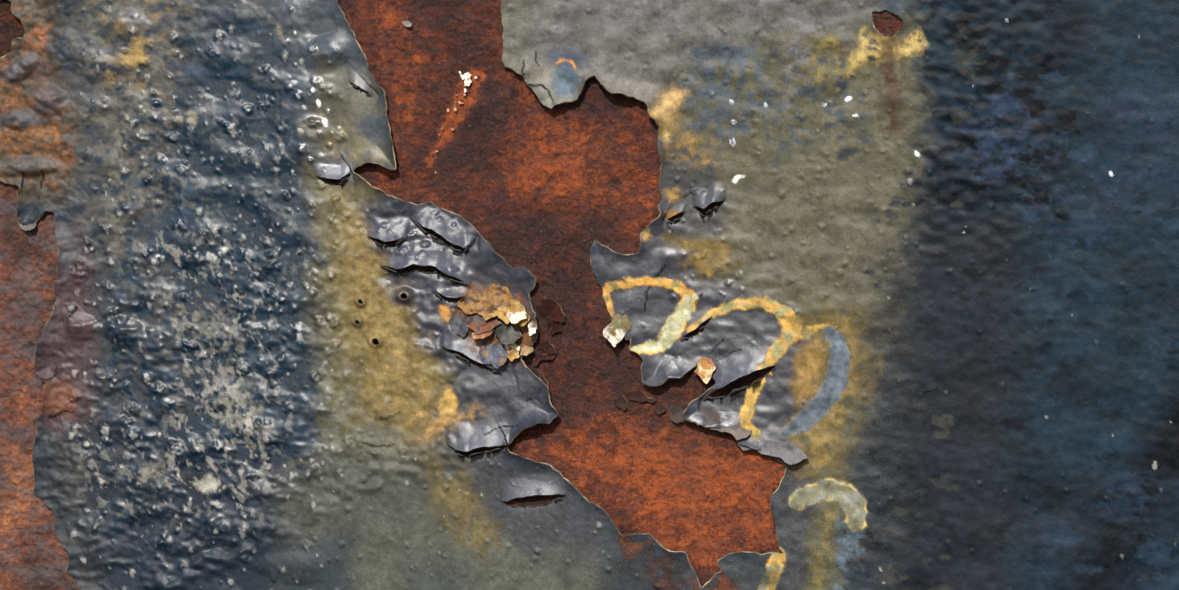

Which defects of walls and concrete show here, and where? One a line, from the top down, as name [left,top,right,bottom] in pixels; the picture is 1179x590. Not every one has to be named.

peeling [0,0,25,57]
rust [32,25,49,48]
leakage [105,36,149,86]
leakage [809,30,926,82]
rust [0,125,74,172]
peeling [338,0,808,587]
leakage [176,305,243,364]
rust [457,284,533,362]
peeling [0,158,80,590]
leakage [204,376,266,456]
leakage [138,463,165,481]
leakage [193,474,221,493]